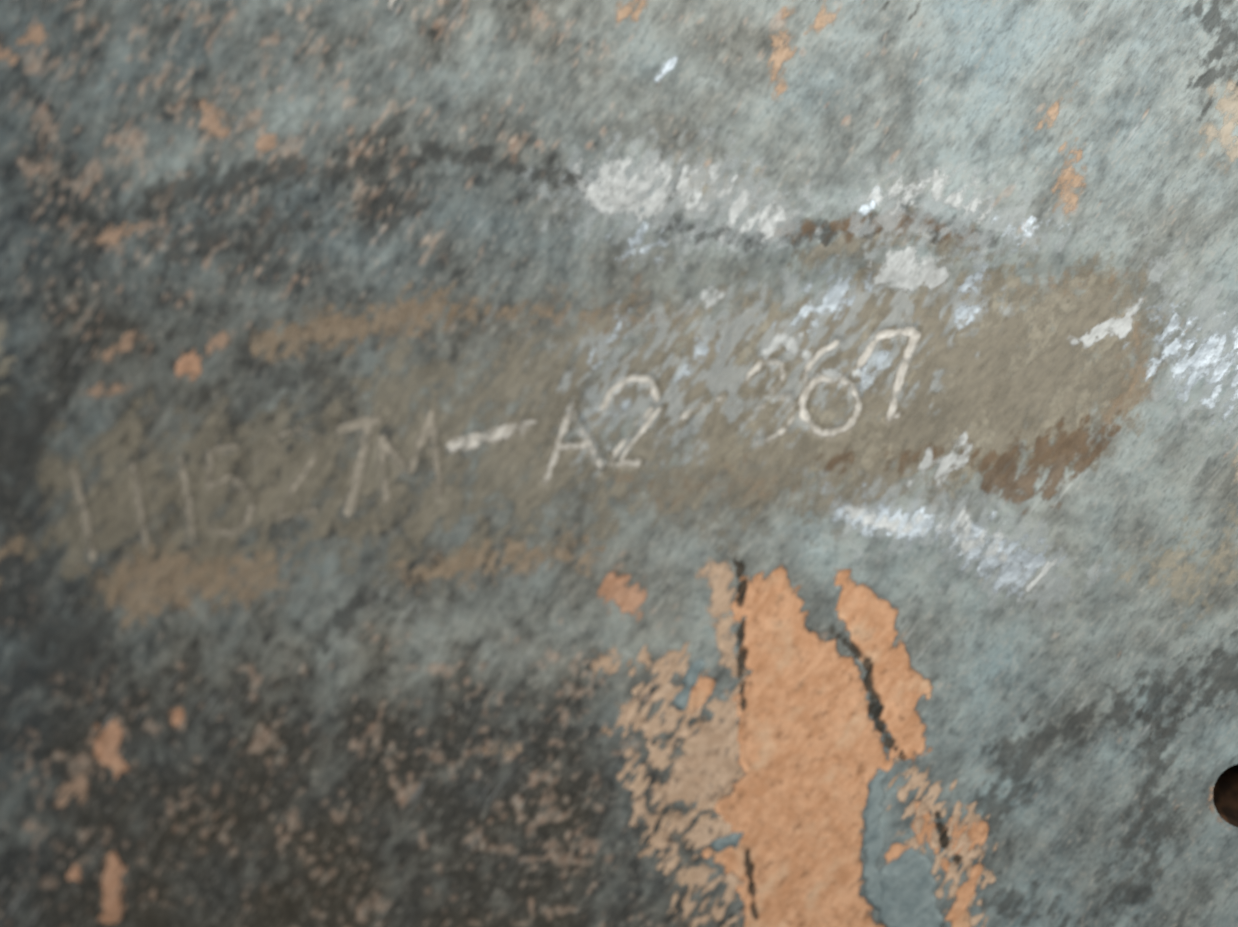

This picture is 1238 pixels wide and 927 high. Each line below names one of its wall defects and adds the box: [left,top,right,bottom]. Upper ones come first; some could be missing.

peeling [591,562,997,927]